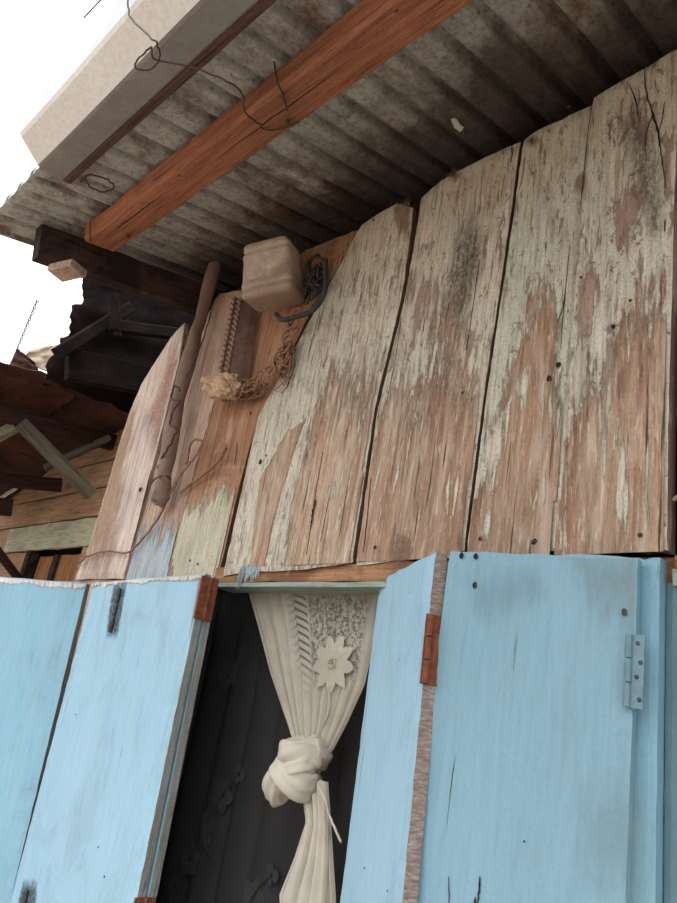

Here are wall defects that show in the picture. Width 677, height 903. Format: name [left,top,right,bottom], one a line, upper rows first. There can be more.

crack [629,67,666,187]
peeling [613,170,647,257]
peeling [237,263,667,587]
peeling [0,483,235,589]